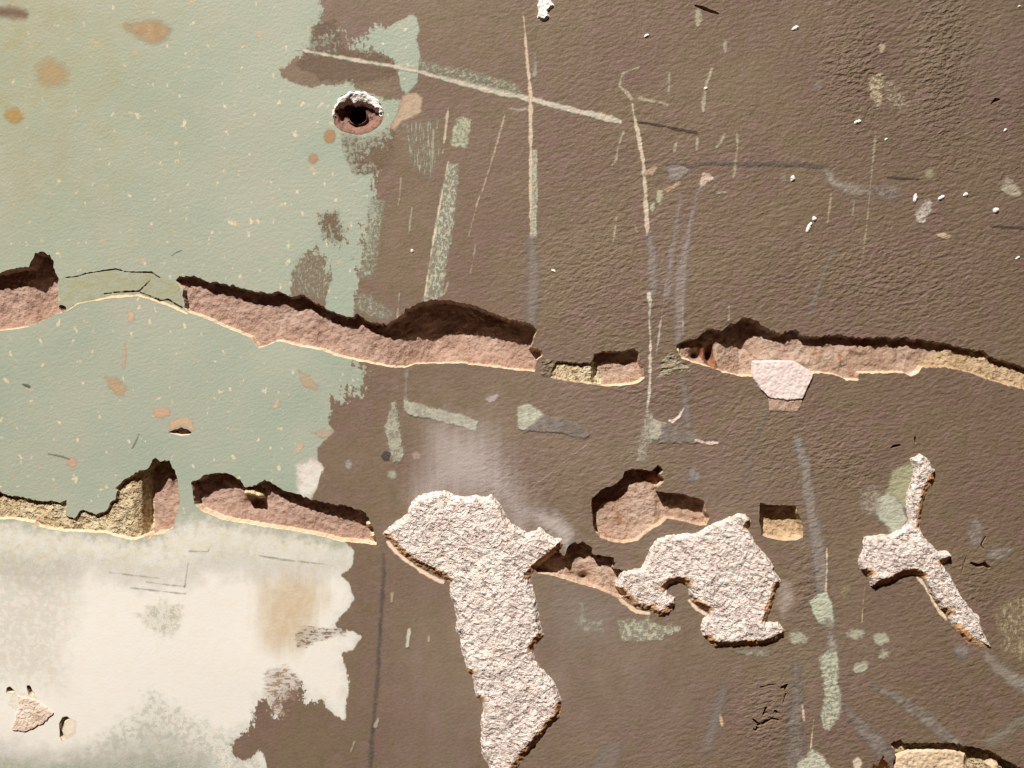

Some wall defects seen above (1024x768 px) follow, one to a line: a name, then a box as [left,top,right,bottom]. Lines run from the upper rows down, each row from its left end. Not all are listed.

crack [59,268,183,311]
flaking render [56,294,1022,412]
spalling [522,465,714,617]
peeling [0,501,454,768]